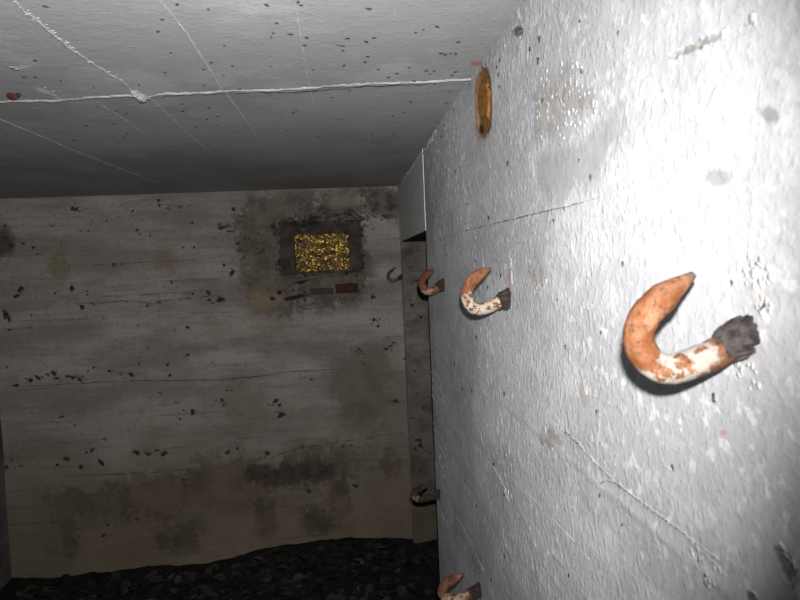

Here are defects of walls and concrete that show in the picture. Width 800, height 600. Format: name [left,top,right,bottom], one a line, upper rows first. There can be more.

crack [151,82,467,99]
water stain [236,189,399,313]
crack [459,196,600,233]
water stain [44,451,360,557]
crack [555,423,728,591]